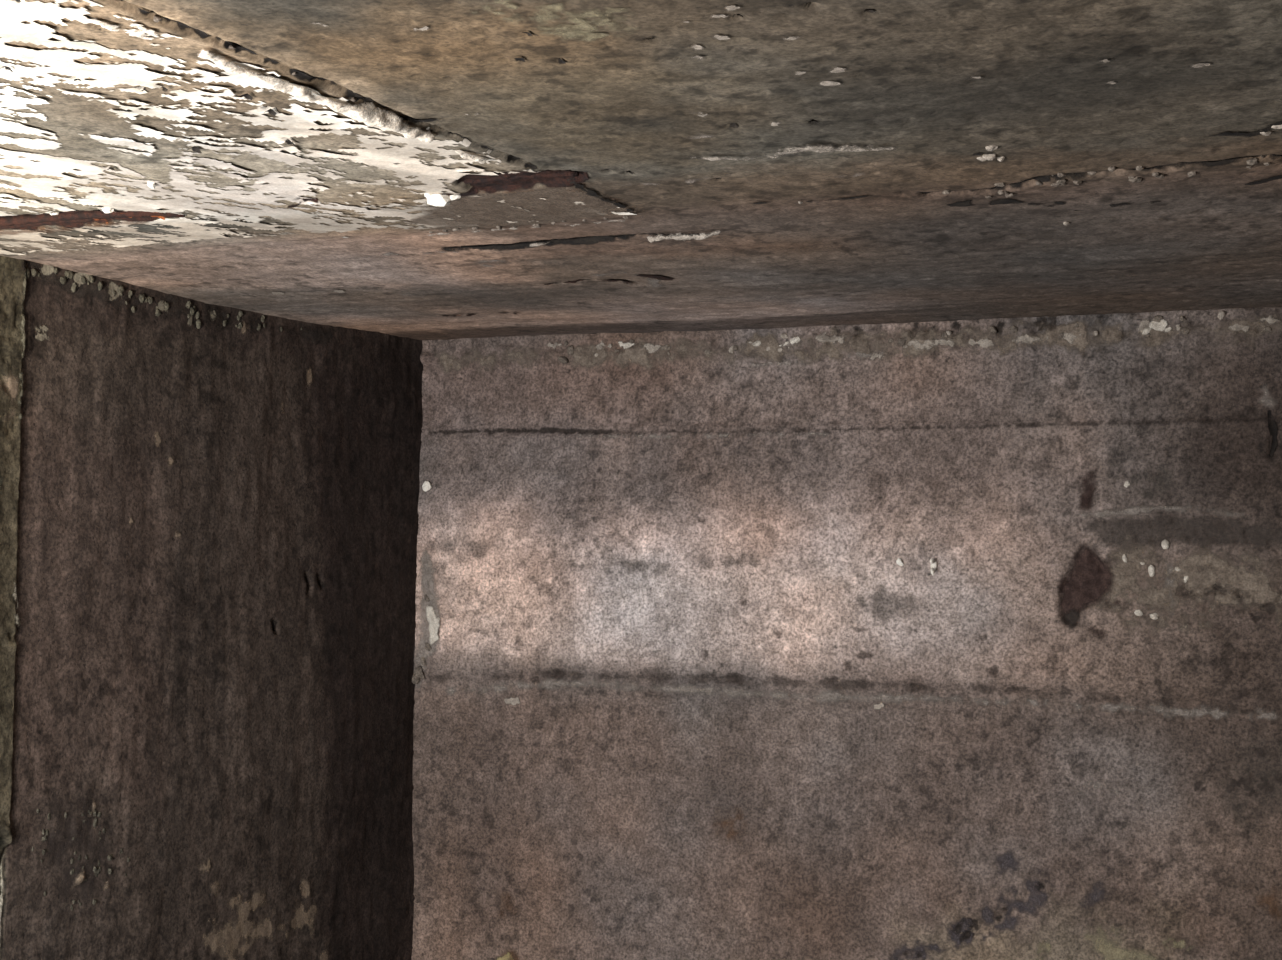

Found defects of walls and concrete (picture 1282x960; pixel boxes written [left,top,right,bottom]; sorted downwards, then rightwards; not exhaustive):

crack [121,0,537,170]
peeling [0,0,637,345]
rust [441,170,589,197]
crack [752,195,867,204]
rust [0,210,185,234]
crack [442,178,720,252]
crack [544,274,673,287]